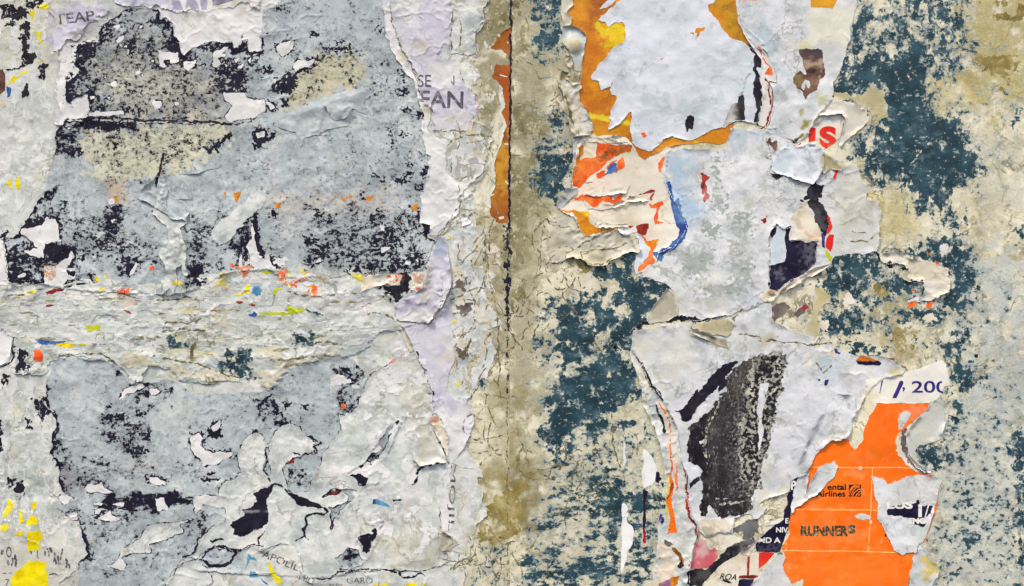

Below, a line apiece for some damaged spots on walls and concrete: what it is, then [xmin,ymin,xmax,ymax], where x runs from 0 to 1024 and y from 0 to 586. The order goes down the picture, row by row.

peeling [18,0,49,98]
peeling [113,24,257,83]
peeling [274,39,315,74]
peeling [89,76,124,117]
peeling [223,90,275,123]
peeling [0,215,76,287]
peeling [118,382,162,401]
peeling [330,374,359,389]
peeling [743,355,783,482]
peeling [189,420,233,468]
peeling [58,481,125,523]
peeling [149,477,169,511]